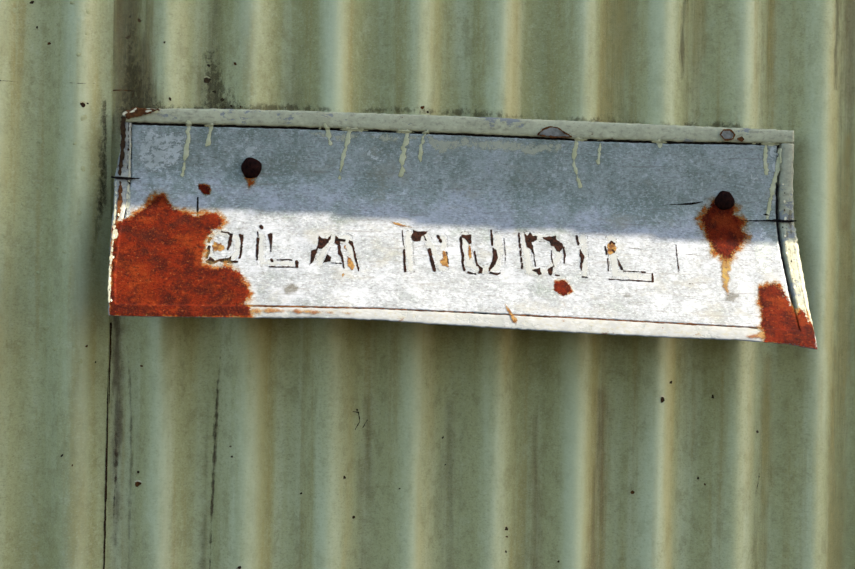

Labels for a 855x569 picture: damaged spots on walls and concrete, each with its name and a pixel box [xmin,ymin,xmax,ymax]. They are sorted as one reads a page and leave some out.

rust [554,280,573,296]
rust [695,198,752,293]
rust [749,281,817,349]
rust [103,191,318,569]